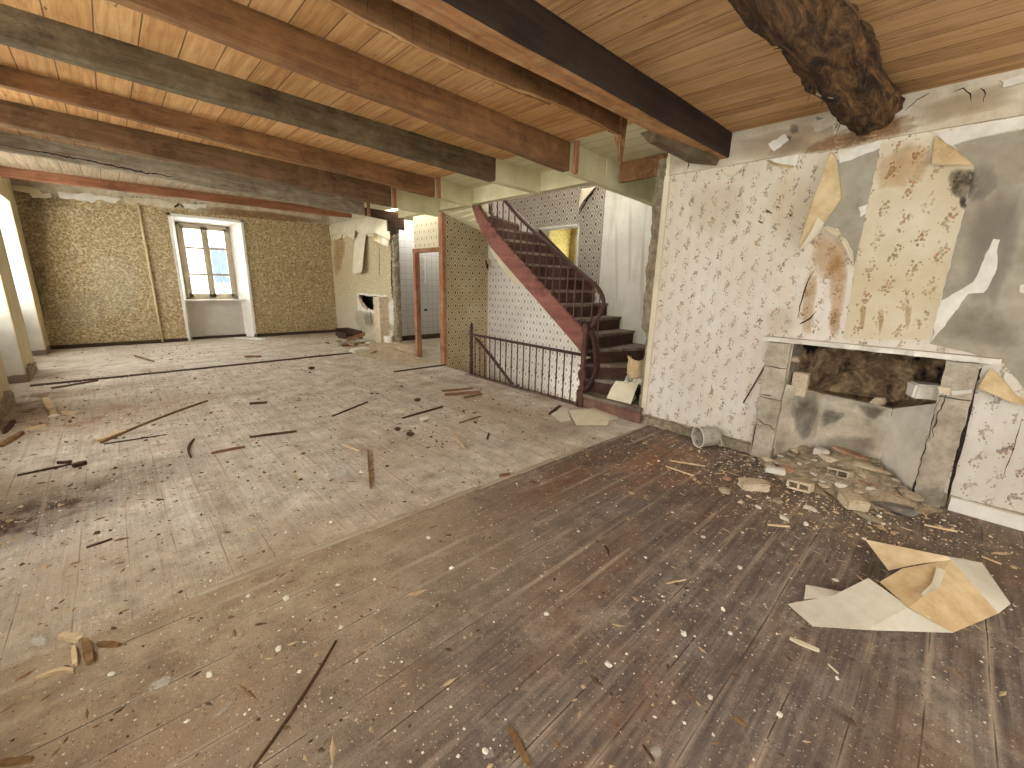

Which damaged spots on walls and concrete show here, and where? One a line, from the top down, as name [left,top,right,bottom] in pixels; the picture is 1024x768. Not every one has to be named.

flaking render [768,134,789,151]
flaking render [812,115,848,134]
crack [3,145,185,179]
damp [952,171,974,208]
flaking render [798,129,1024,403]
crack [912,368,982,508]